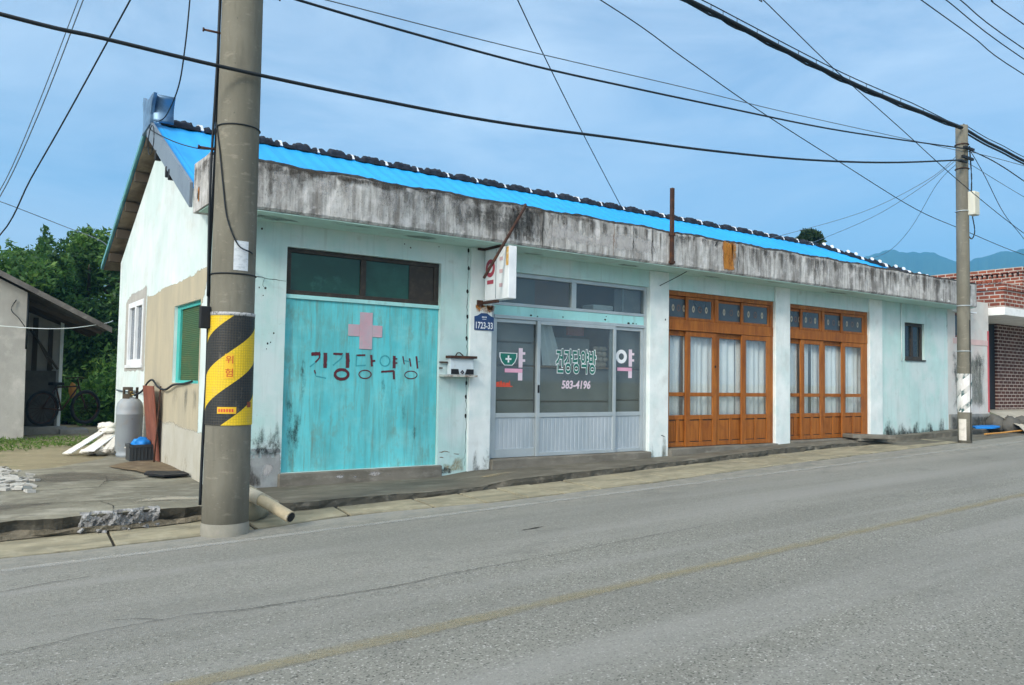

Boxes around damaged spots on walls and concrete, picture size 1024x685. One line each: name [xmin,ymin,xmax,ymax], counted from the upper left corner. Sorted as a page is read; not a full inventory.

water stain [260,162,410,207]
water stain [423,190,661,252]
rust [722,241,736,270]
water stain [971,359,983,404]
water stain [886,419,958,435]
spalling [77,505,161,534]